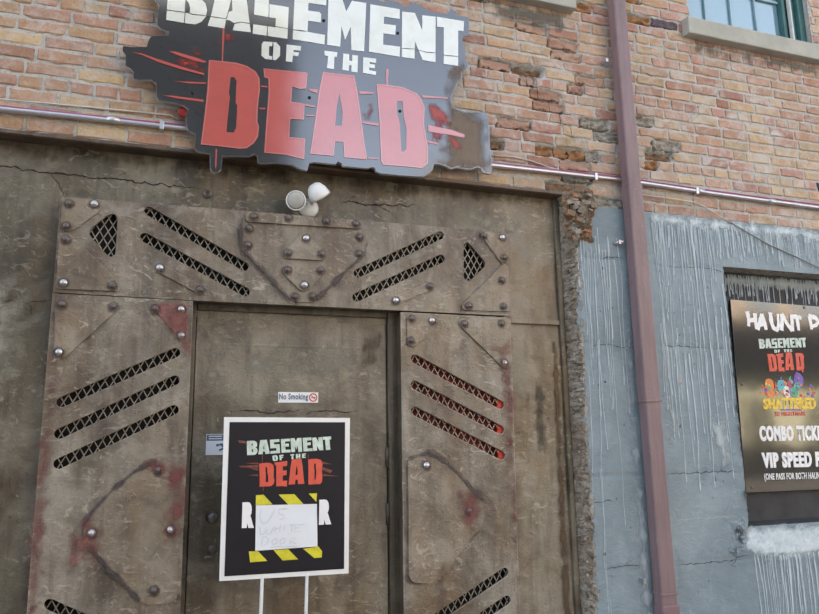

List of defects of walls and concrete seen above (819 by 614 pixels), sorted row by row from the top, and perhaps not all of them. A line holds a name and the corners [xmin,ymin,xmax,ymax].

spalling [478,59,603,115]
spalling [495,118,529,132]
spalling [578,118,619,145]
crack [0,166,205,197]
crack [342,200,417,212]
damp [577,228,629,476]
spalling [535,146,623,614]
spalling [728,517,748,558]